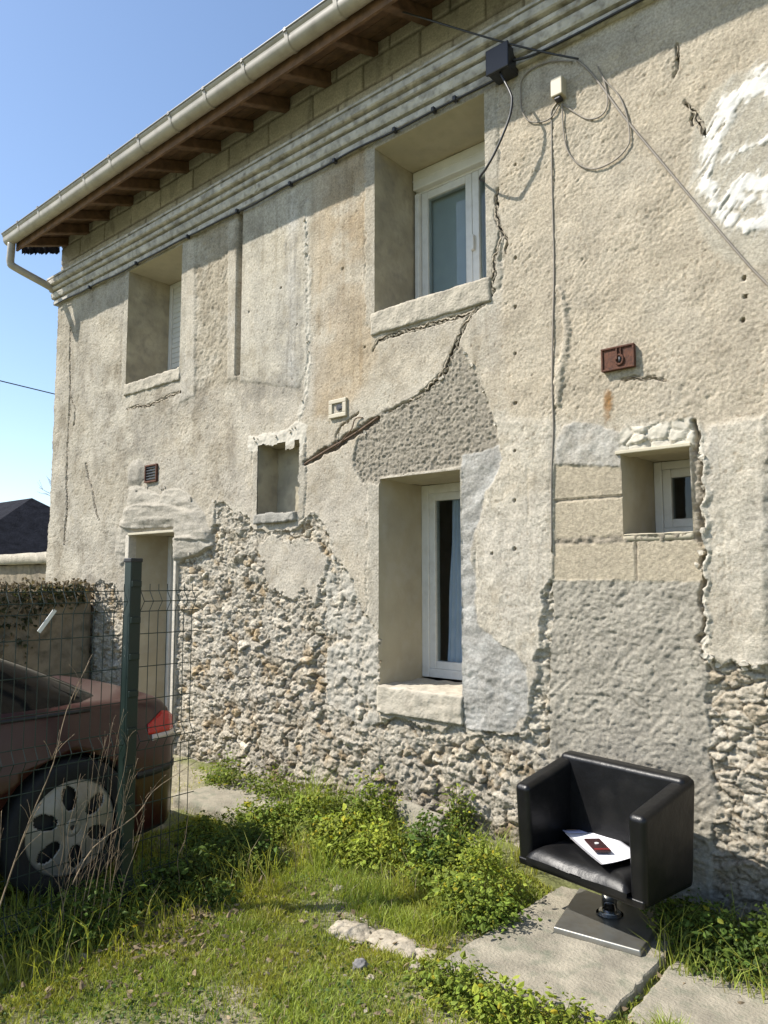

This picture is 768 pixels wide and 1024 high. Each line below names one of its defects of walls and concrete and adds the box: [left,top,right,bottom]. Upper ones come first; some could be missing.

crack [671,44,680,75]
crack [684,101,705,136]
flaking render [353,343,499,484]
crack [373,189,509,416]
spalling [175,500,555,848]
spalling [700,652,768,930]